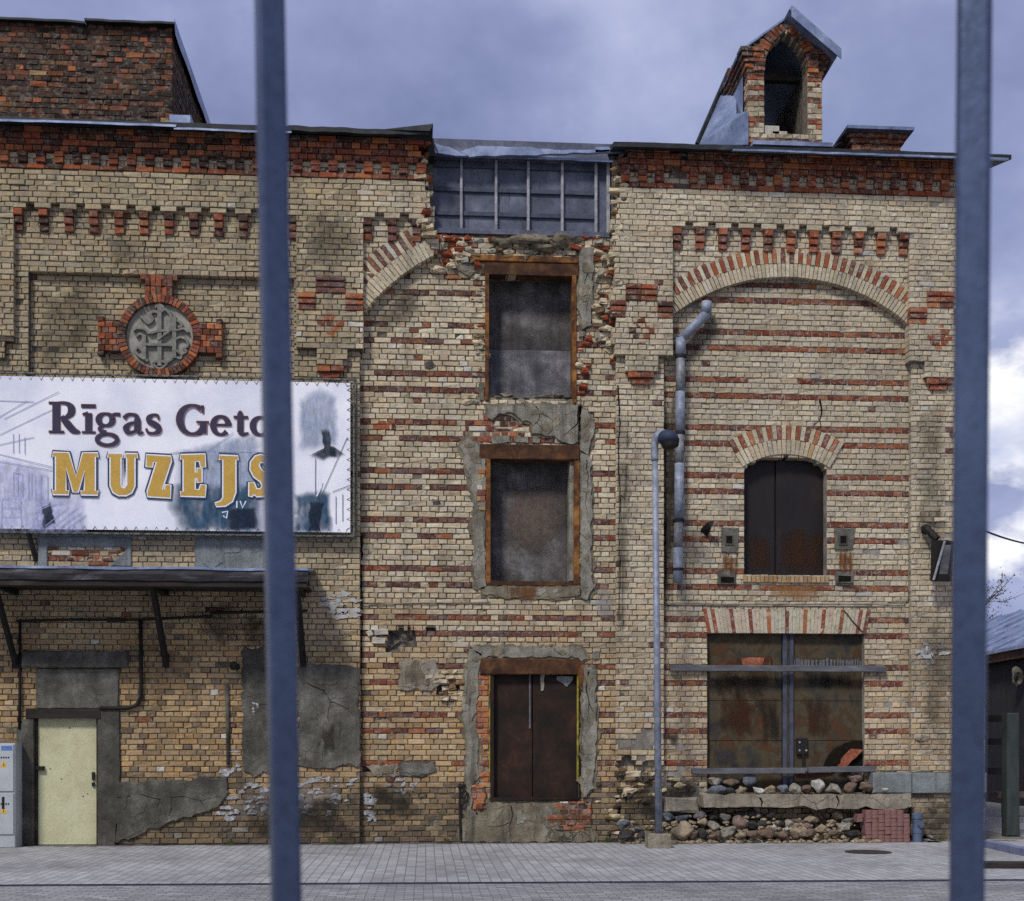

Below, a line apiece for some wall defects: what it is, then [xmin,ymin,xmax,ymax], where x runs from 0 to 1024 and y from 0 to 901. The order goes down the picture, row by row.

peeling [414,143,629,601]
peeling [319,590,362,620]
peeling [405,644,699,843]